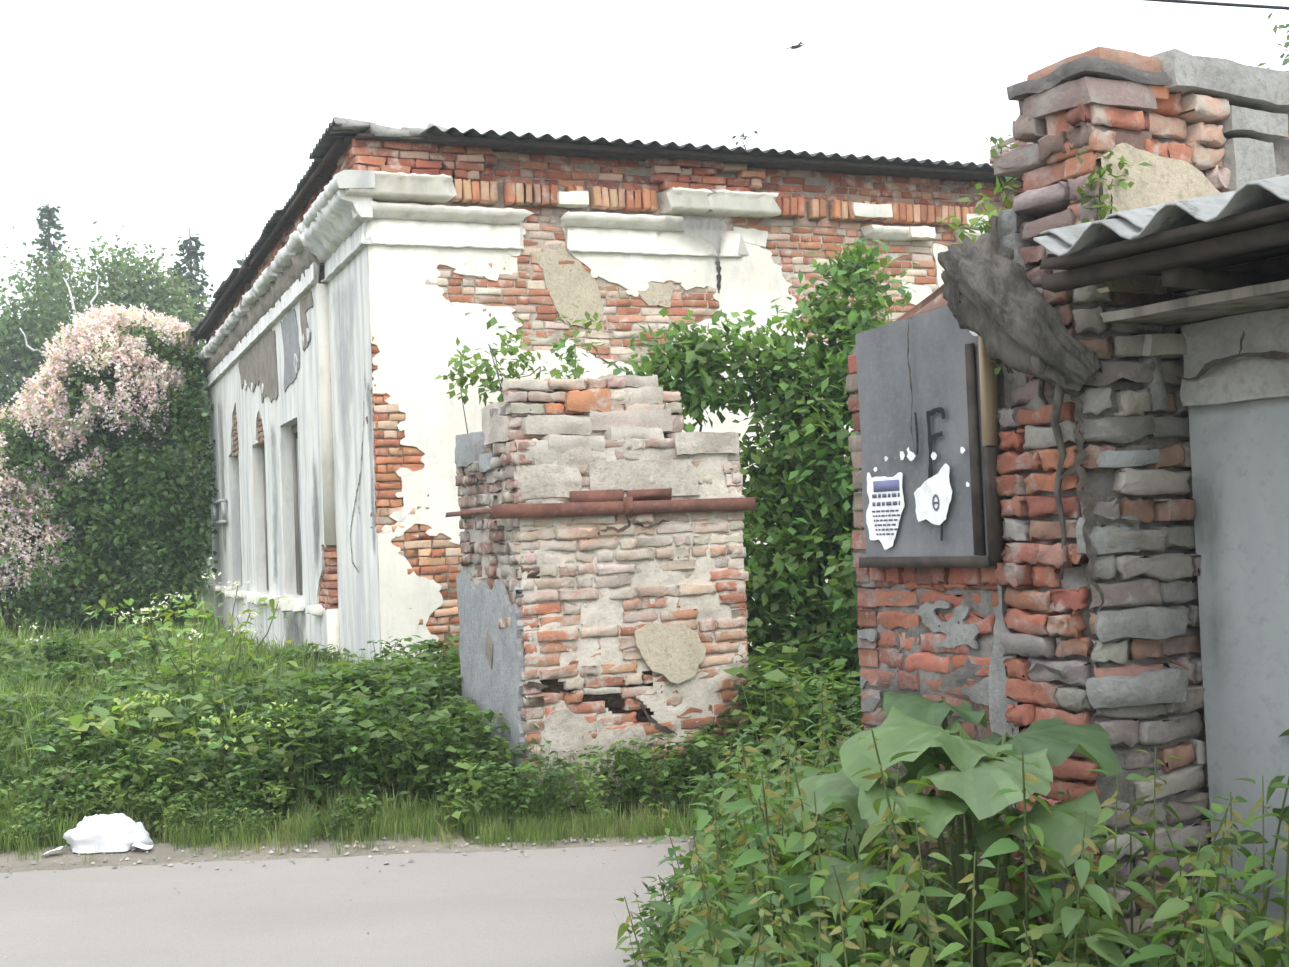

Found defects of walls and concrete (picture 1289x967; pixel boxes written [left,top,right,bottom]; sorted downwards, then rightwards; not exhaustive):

flaking render [425,206,729,367]
flaking render [722,217,980,345]
flaking render [231,409,239,457]
flaking render [238,291,314,446]
flaking render [318,545,338,610]
flaking render [366,337,463,656]
spalling [846,354,1020,742]
spalling [865,816,1025,908]